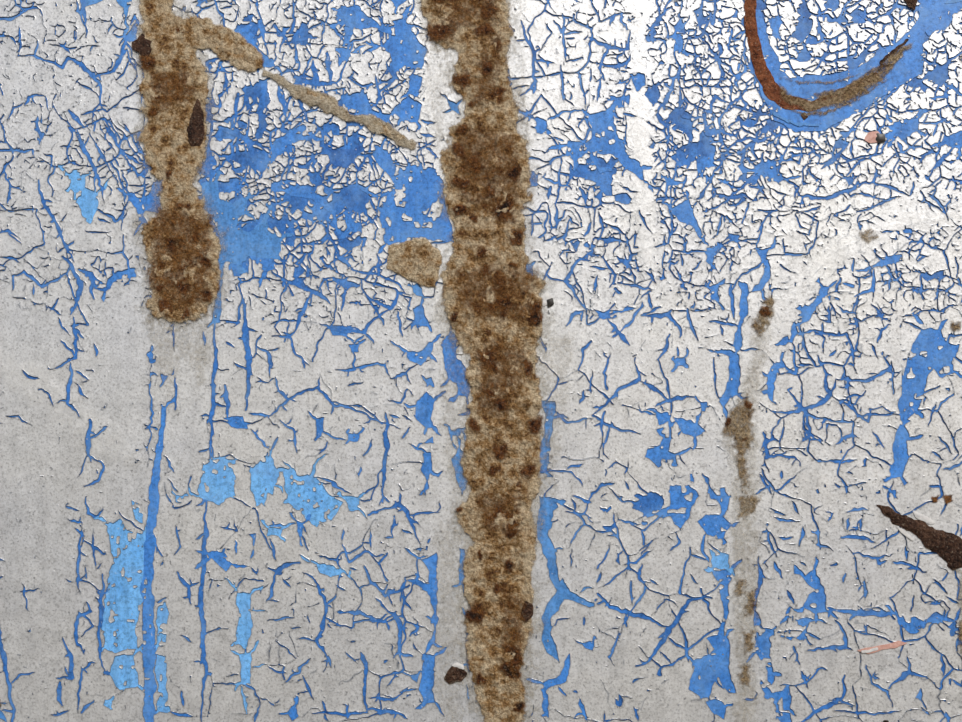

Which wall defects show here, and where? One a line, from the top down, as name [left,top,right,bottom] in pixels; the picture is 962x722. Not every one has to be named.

crack [0,0,137,722]
peeling [94,345,177,722]
corrosion [132,0,417,323]
crack [199,251,441,719]
peeling [325,0,435,130]
peeling [361,145,454,253]
corrosion [386,0,546,722]
peeling [518,69,742,310]
crack [530,186,737,459]
crack [623,69,962,229]
crack [760,304,895,494]
peeling [877,312,962,571]